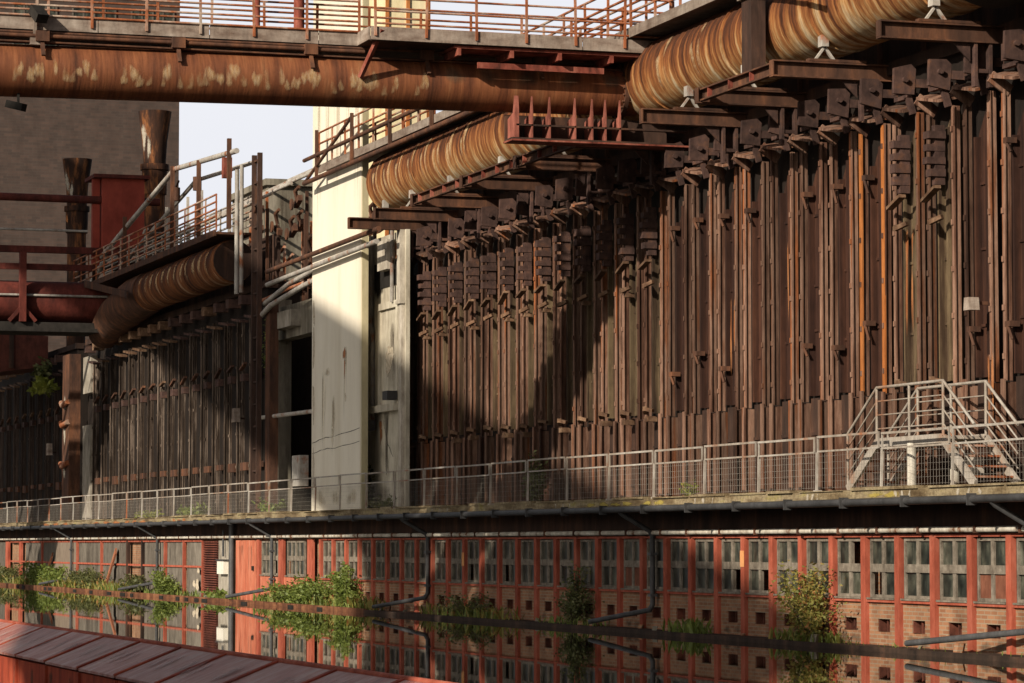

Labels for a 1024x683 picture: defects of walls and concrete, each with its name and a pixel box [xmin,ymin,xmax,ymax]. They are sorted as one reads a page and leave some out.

crack [312,420,393,474]